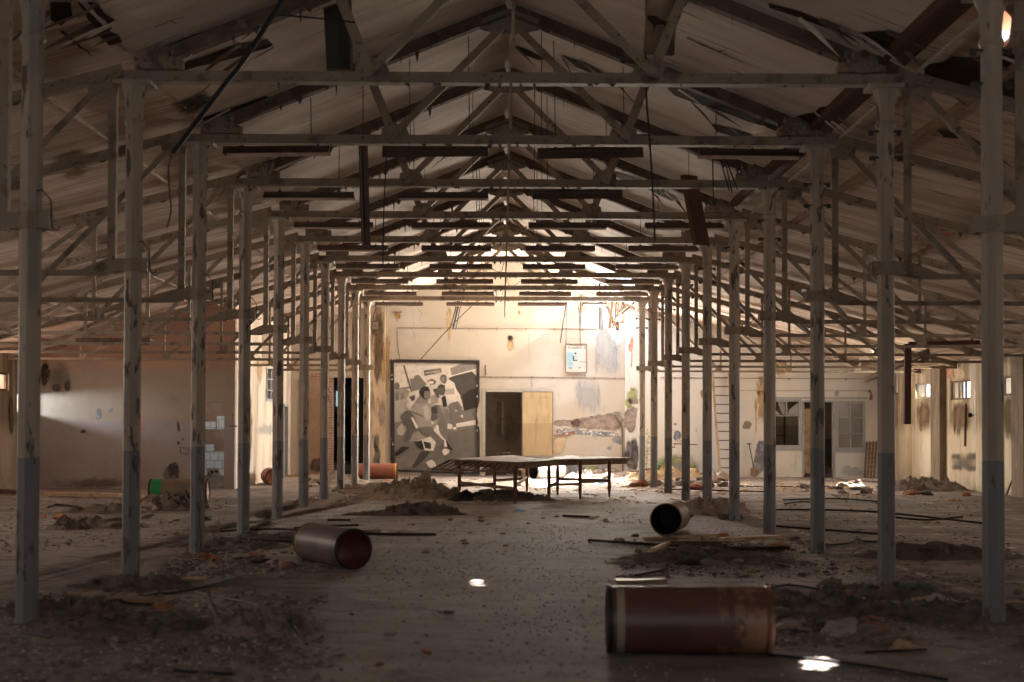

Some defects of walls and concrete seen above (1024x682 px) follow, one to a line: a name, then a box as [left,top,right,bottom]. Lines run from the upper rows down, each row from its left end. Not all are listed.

spalling [553,398,638,454]